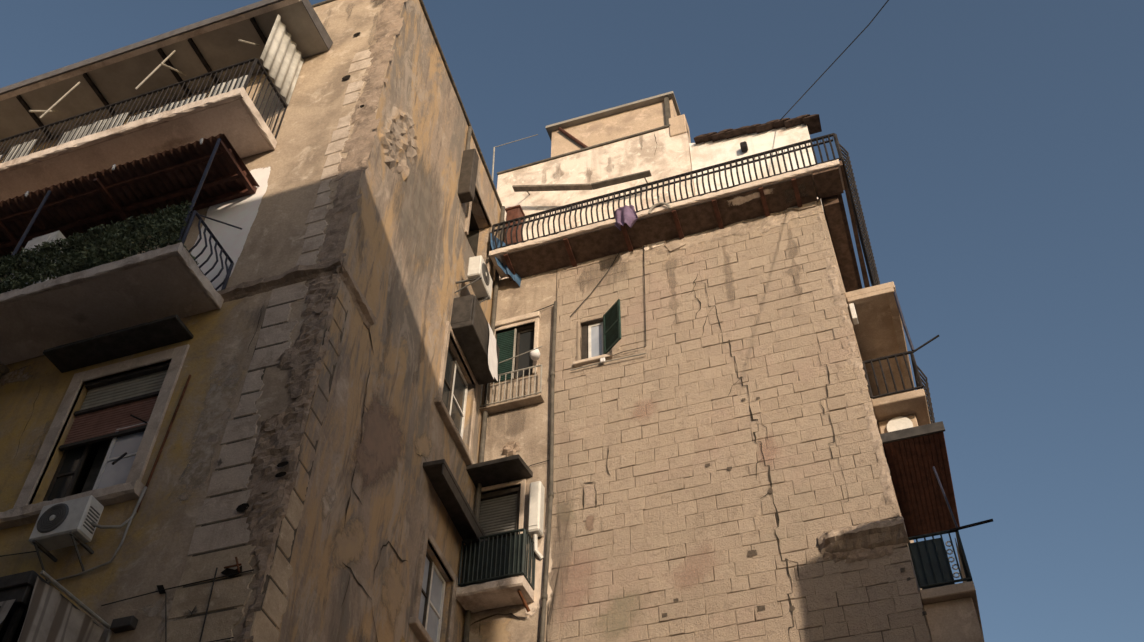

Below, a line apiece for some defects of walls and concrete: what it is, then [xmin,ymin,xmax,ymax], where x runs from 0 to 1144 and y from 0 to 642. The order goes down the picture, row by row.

spalling [221,0,408,642]
crack [690,271,800,642]